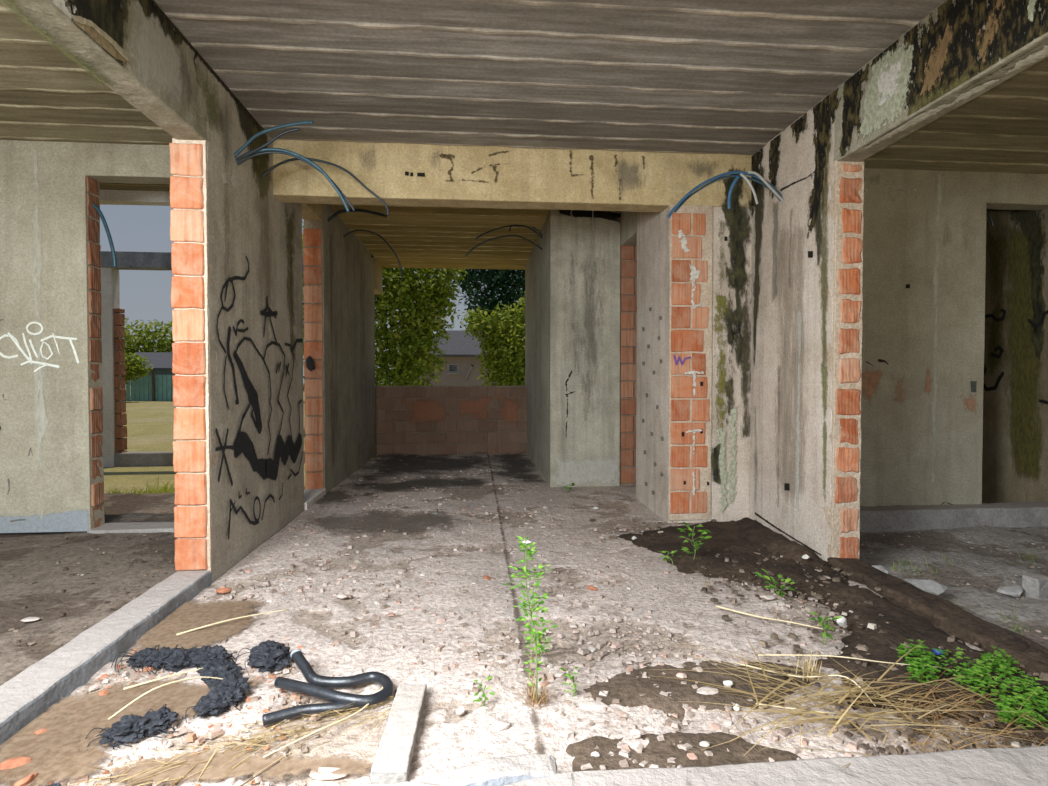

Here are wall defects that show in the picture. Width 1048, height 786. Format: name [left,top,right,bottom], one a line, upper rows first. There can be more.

water stain [65,0,182,94]
peeling [864,43,1048,149]
water stain [722,0,1048,437]
flaking render [835,163,883,559]
water stain [711,444,721,484]